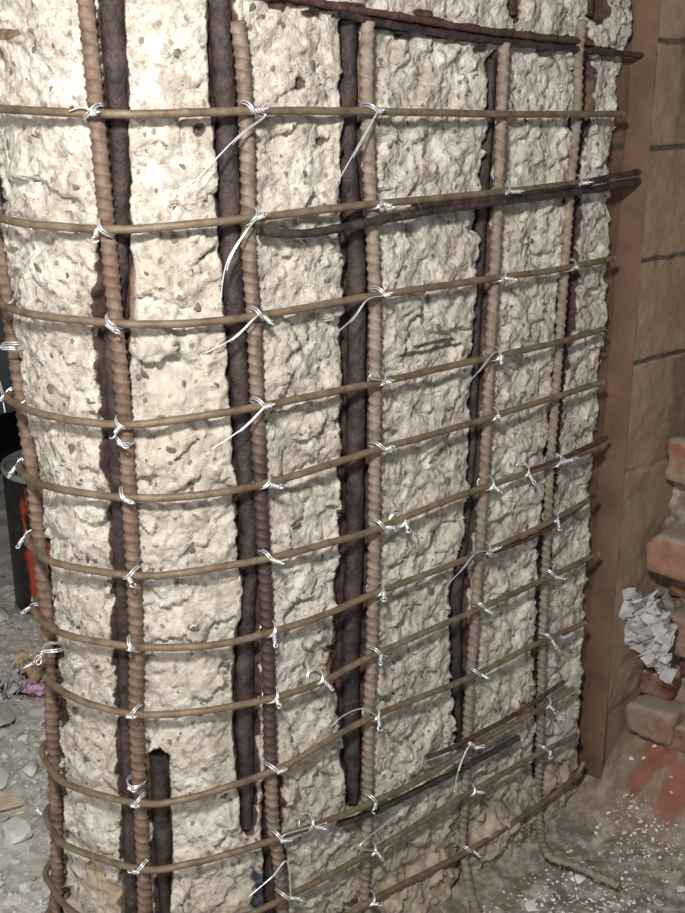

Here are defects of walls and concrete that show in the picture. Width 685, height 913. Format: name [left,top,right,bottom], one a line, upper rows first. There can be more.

spalling [0,192,108,913]
rust [99,0,135,339]
rust [103,296,138,913]
spalling [76,0,199,913]
rust [145,749,172,913]
rust [208,0,276,913]
spalling [229,2,289,913]
spalling [358,21,394,913]
rust [257,0,644,827]
spalling [457,206,510,913]
spalling [493,42,512,189]
spalling [525,196,622,889]